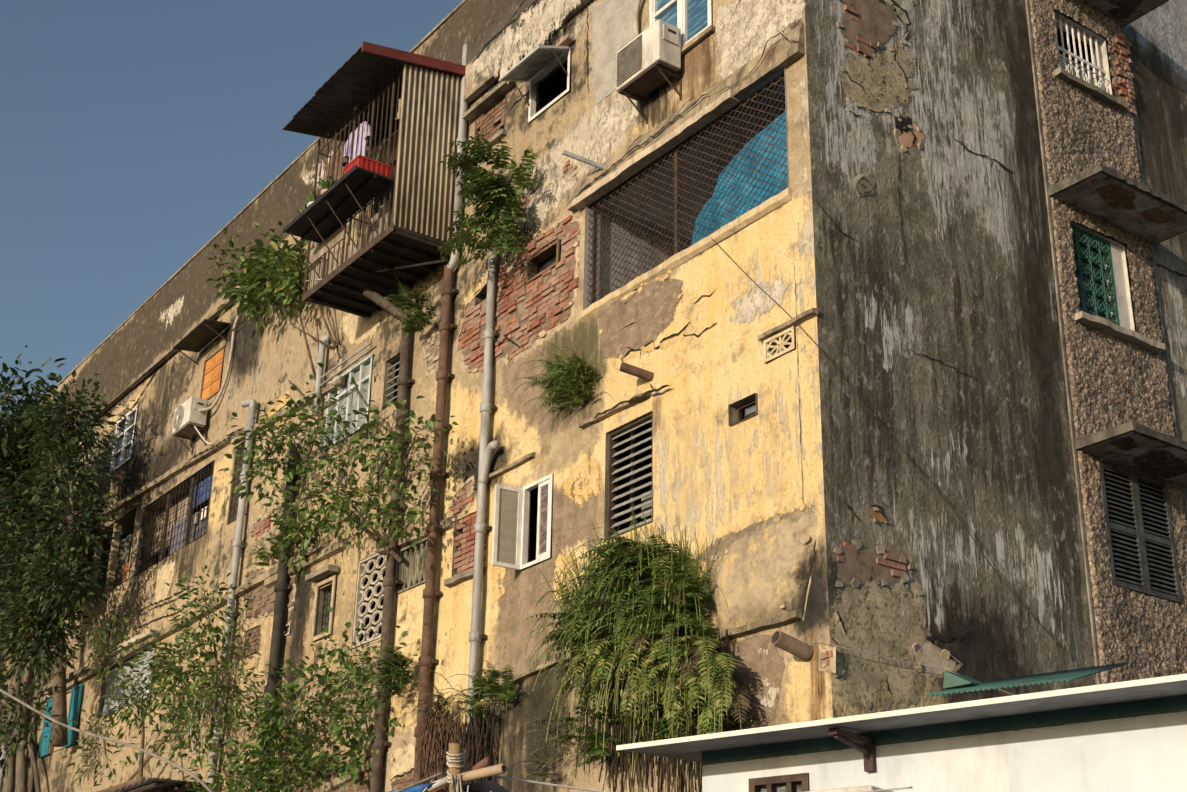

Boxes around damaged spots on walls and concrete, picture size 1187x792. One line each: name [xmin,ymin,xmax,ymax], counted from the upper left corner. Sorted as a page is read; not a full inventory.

water stain [814,0,850,164]
peeling [835,0,927,155]
flaking render [1111,33,1137,116]
peeling [158,296,184,330]
flaking render [422,0,640,381]
crack [592,270,716,419]
water stain [856,292,927,372]
water stain [895,0,1063,488]
efflorescence [1162,269,1187,398]
water stain [119,361,195,516]
water stain [448,431,510,496]
peeling [818,539,963,714]